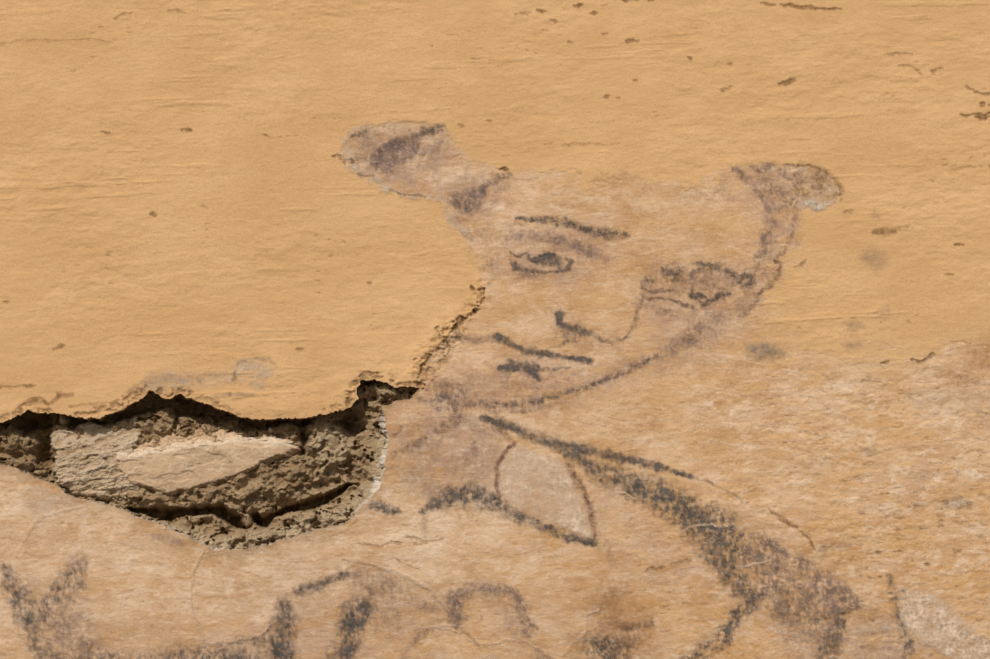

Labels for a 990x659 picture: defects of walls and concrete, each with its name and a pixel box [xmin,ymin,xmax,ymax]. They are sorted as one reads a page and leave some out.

spalling [0,379,420,551]